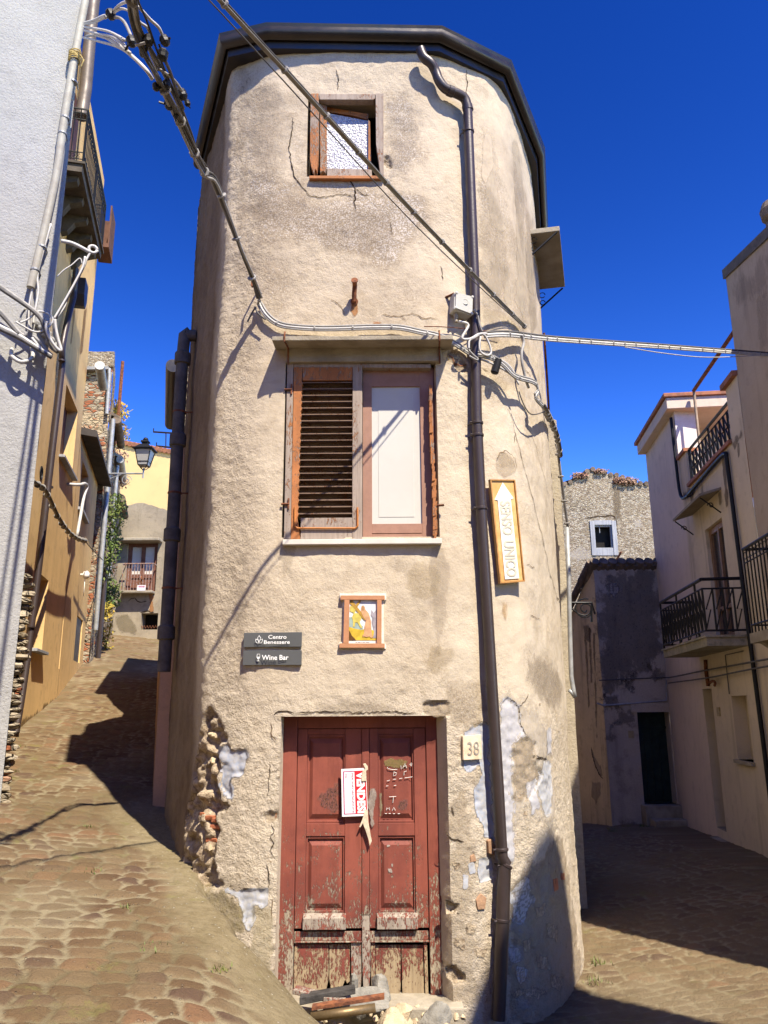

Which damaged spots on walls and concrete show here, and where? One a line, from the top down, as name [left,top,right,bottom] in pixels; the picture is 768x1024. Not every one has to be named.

crack [288,117,367,209]
spalling [183,707,269,931]
peeling [463,696,553,910]